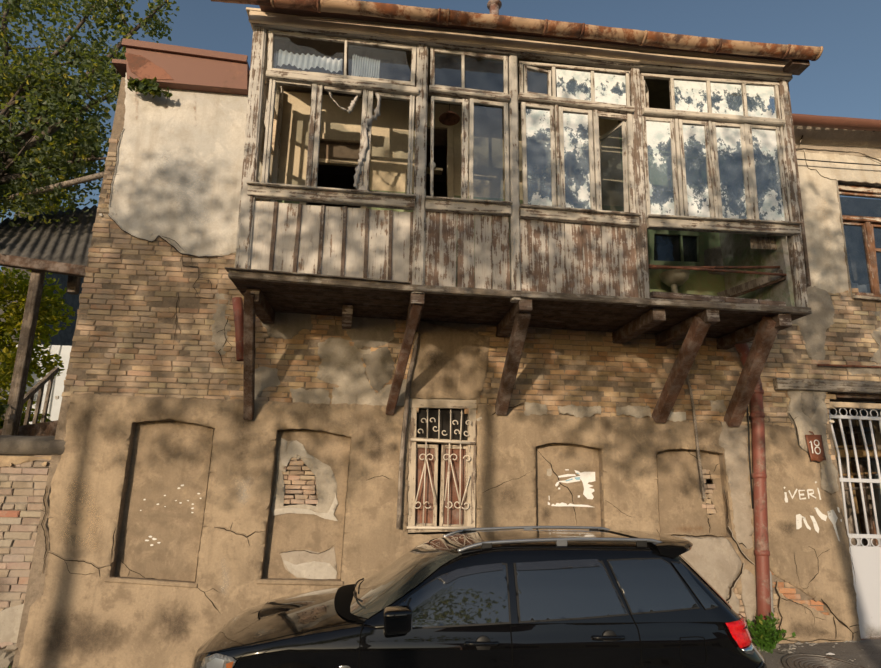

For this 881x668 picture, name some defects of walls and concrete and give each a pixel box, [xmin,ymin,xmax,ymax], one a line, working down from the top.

crack [796,135,881,180]
spalling [55,138,244,400]
spalling [255,314,416,404]
spalling [509,327,685,417]
spalling [671,338,743,423]
spalling [760,288,881,428]
spalling [0,455,51,611]
crack [40,486,155,579]
peeling [271,438,338,521]
crack [538,451,577,525]
crack [657,491,755,618]
crack [775,546,858,641]